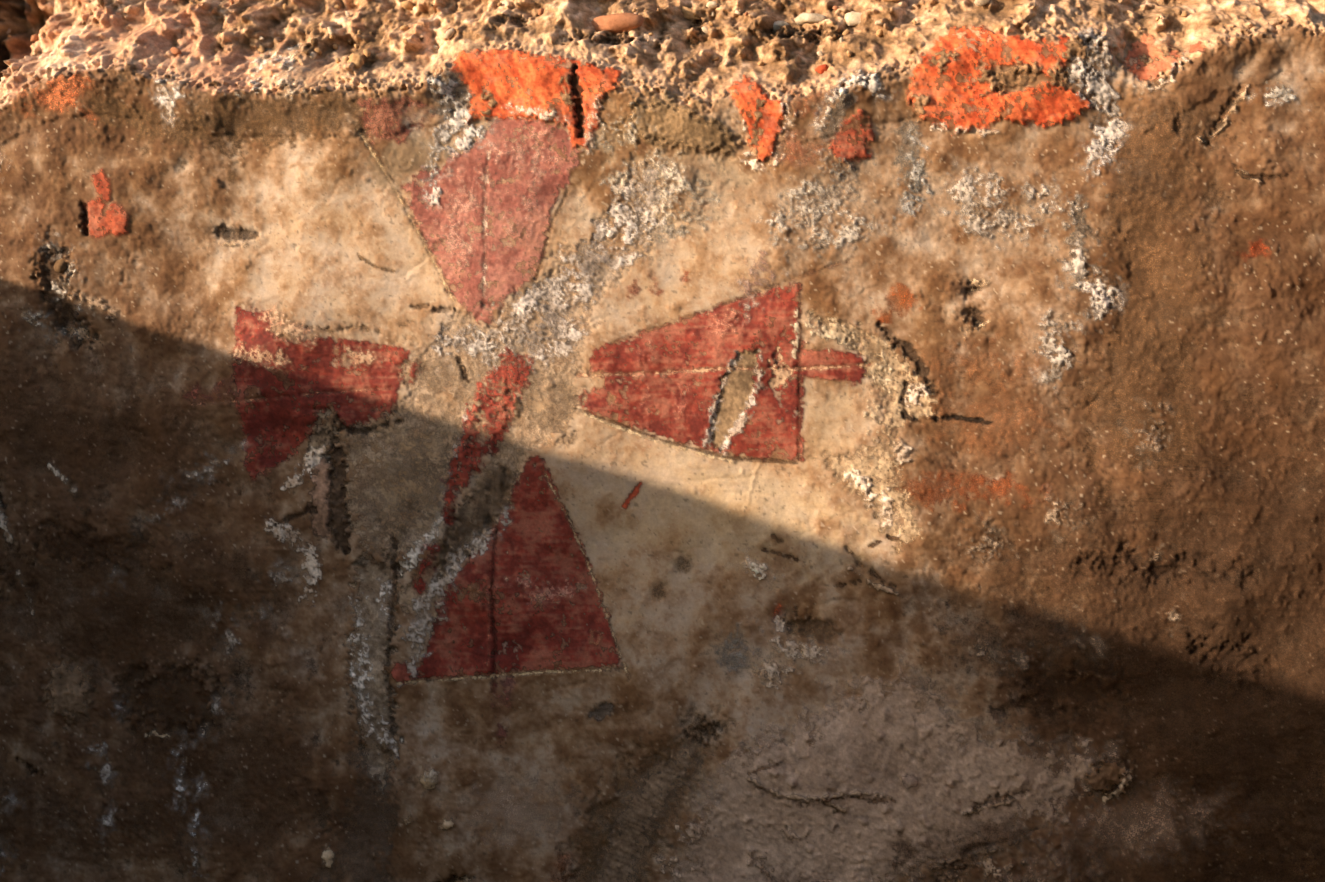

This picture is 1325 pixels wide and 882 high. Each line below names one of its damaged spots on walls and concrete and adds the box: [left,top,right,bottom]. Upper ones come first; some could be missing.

water stain [426,69,485,206]
flaking render [450,48,621,153]
water stain [601,150,718,239]
flaking render [728,75,793,169]
water stain [768,74,891,249]
flaking render [829,109,875,162]
flaking render [906,25,1093,135]
flaking render [1124,33,1205,90]
water stain [892,27,1325,882]
water stain [743,559,767,580]
water stain [717,615,828,689]